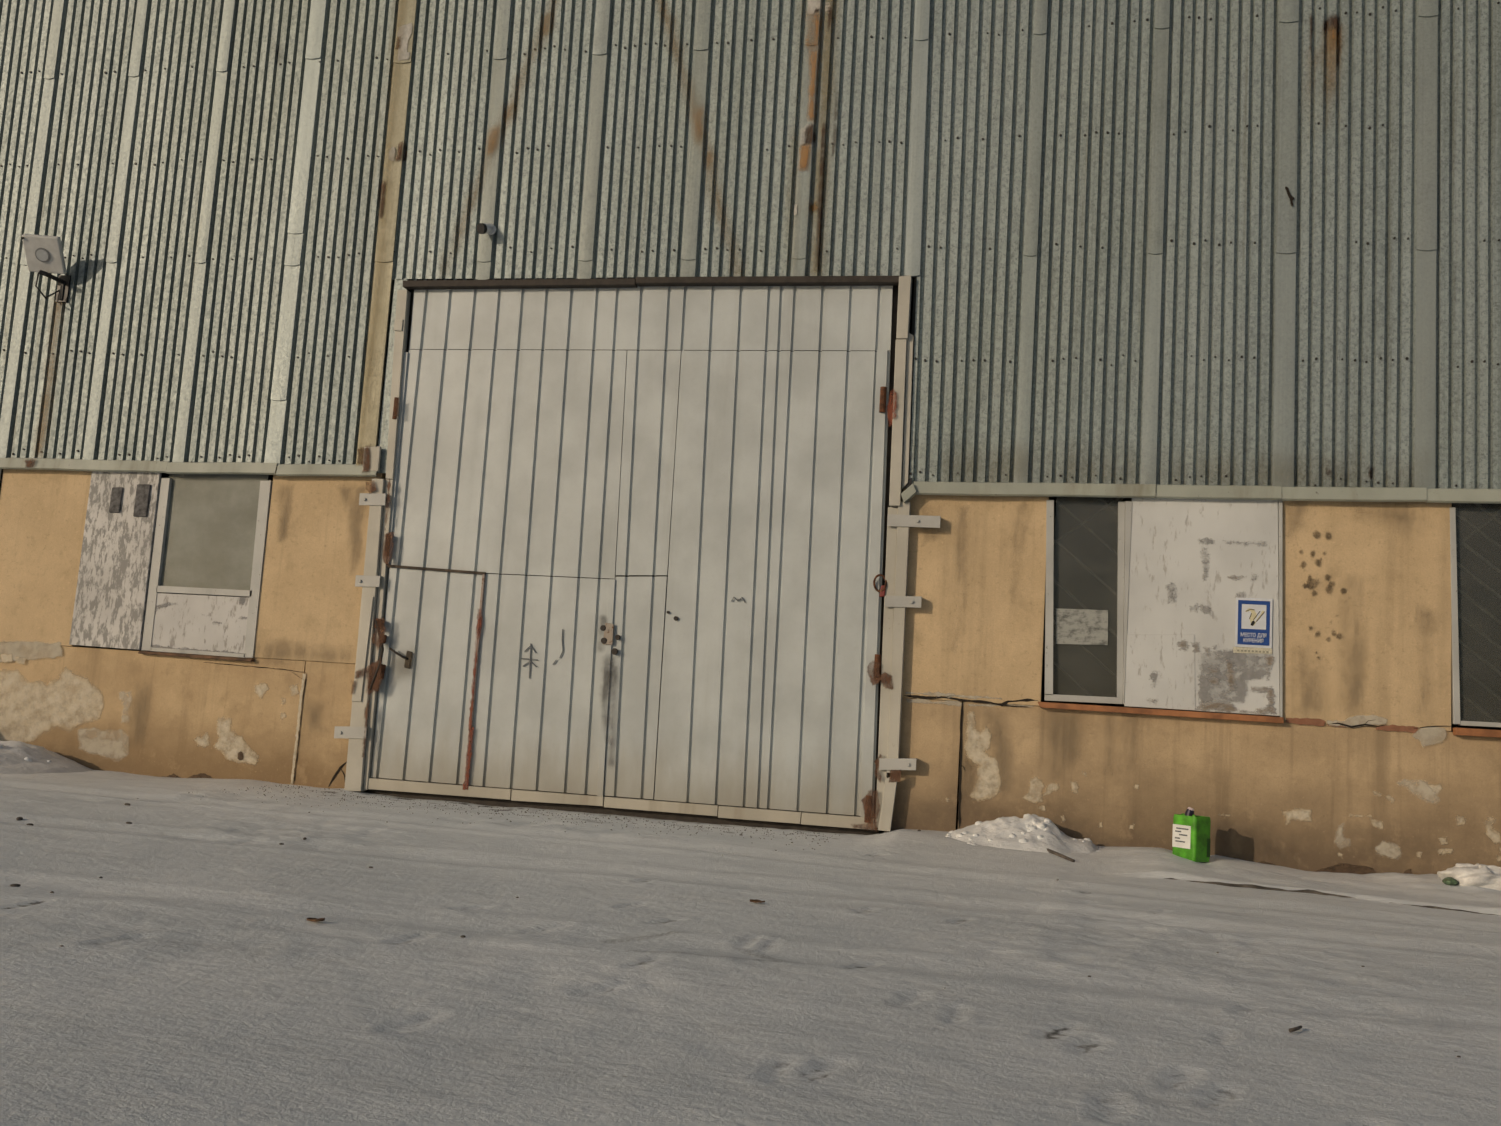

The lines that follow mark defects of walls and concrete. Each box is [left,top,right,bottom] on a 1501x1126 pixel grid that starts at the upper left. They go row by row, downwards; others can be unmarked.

rust [1310,15,1340,64]
rust [794,0,836,265]
flaking render [0,654,131,757]
flaking render [195,719,258,764]
rust [463,610,483,790]
rust [867,661,893,689]
flaking render [906,692,1033,801]
crack [904,695,1038,827]
flaking render [1022,773,1086,821]
peeling [1178,640,1347,727]
flaking render [1376,725,1418,733]
flaking render [1316,814,1465,875]